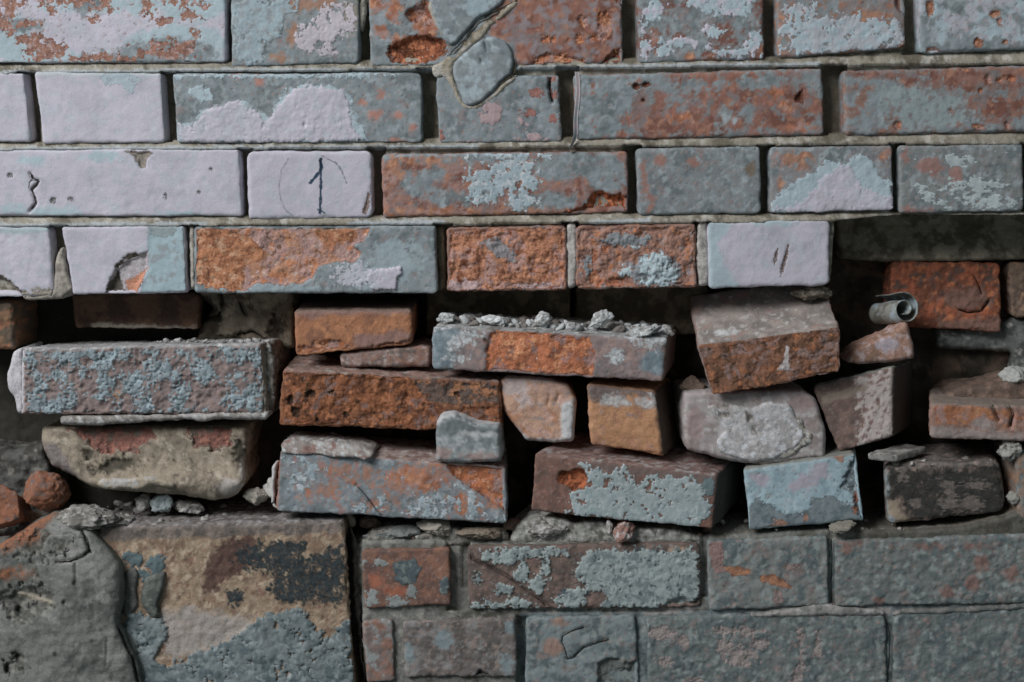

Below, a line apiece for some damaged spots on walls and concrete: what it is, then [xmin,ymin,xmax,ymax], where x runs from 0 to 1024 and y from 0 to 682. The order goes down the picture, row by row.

peeling [0,0,213,95]
peeling [173,0,451,143]
peeling [444,76,557,214]
peeling [771,151,912,213]
spalling [106,227,408,293]
spalling [448,225,696,291]
peeling [22,345,264,414]
spalling [281,330,596,430]
spalling [699,328,839,394]
peeling [556,462,716,528]
peeling [470,541,801,609]
peeling [123,606,354,682]